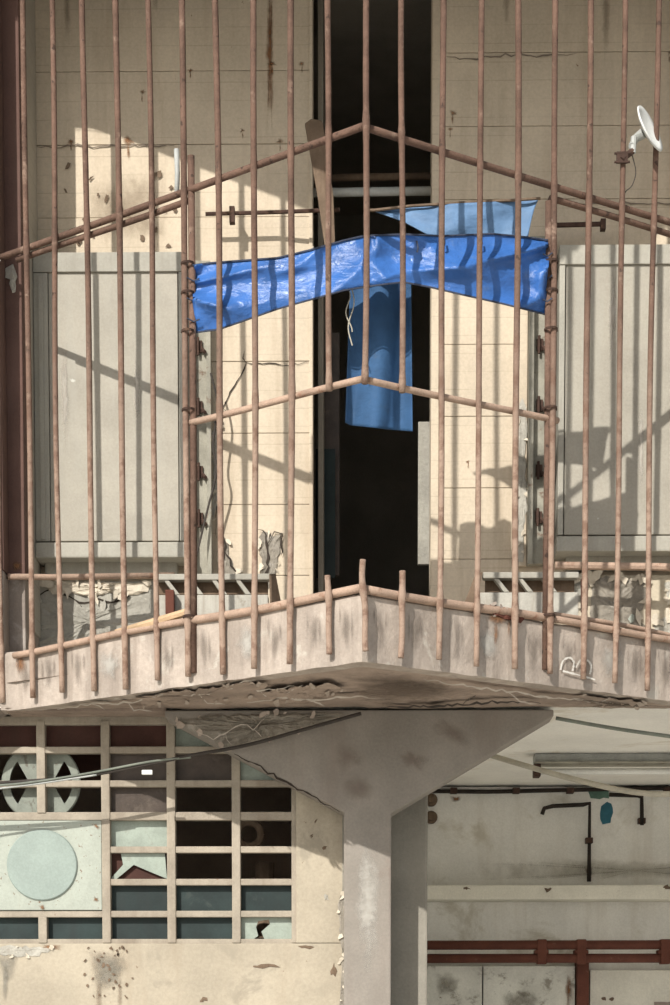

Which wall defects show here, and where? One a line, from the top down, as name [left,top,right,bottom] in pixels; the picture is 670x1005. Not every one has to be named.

corrosion [267,8,275,100]
spalling [216,538,243,574]
spalling [258,530,281,588]
flaking render [39,580,153,645]
flaking render [574,570,670,633]
spalling [175,688,344,751]